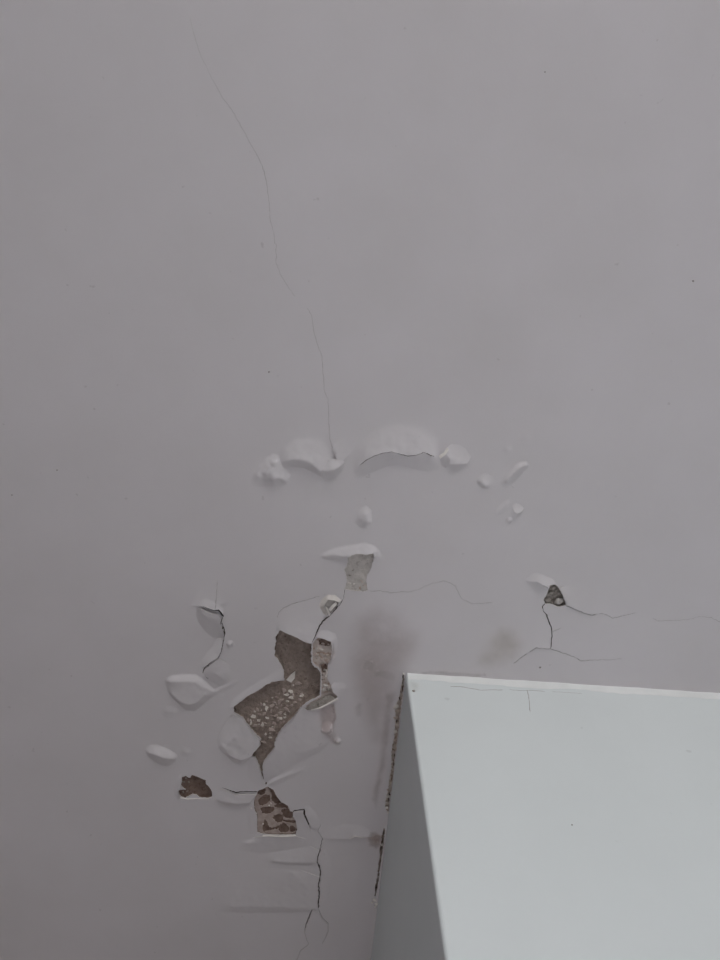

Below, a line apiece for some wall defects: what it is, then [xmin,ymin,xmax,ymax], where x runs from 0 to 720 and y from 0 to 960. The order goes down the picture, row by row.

spalling [174,542,386,854]
spalling [525,573,607,615]
crack [510,604,633,663]
crack [293,805,328,959]